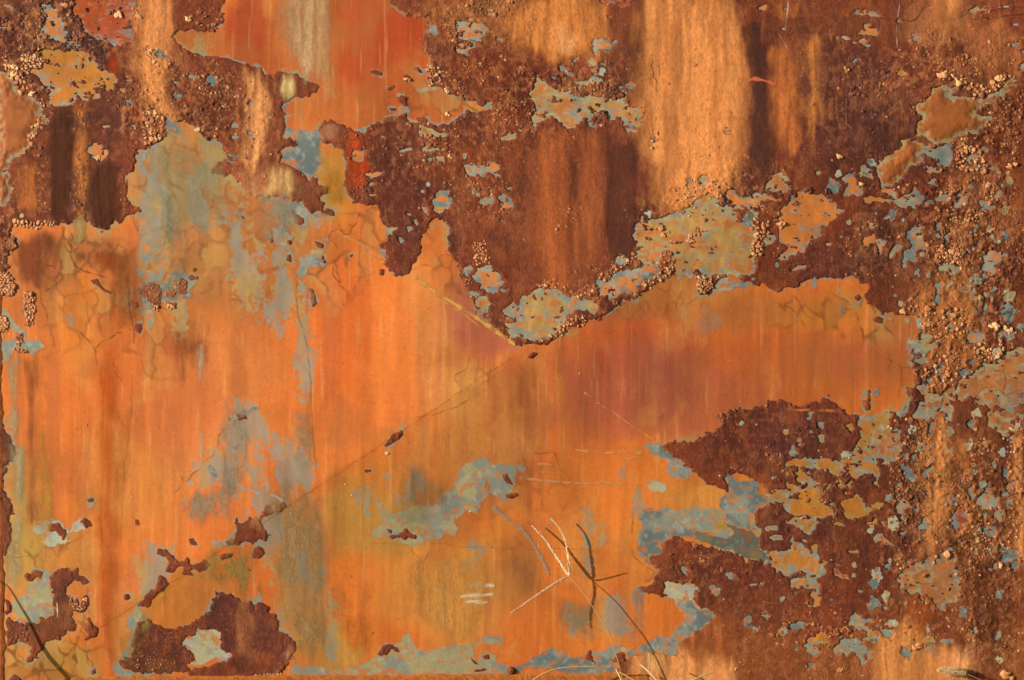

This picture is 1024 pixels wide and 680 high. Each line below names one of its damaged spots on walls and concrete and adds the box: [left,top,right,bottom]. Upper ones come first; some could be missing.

peeling [136,149,148,171]
rust [0,0,335,353]
peeling [163,115,182,135]
peeling [134,250,198,332]
peeling [271,201,328,298]
rust [318,0,1024,680]
peeling [462,64,1024,607]
peeling [371,456,527,547]
rust [4,567,99,663]
rust [118,501,296,676]